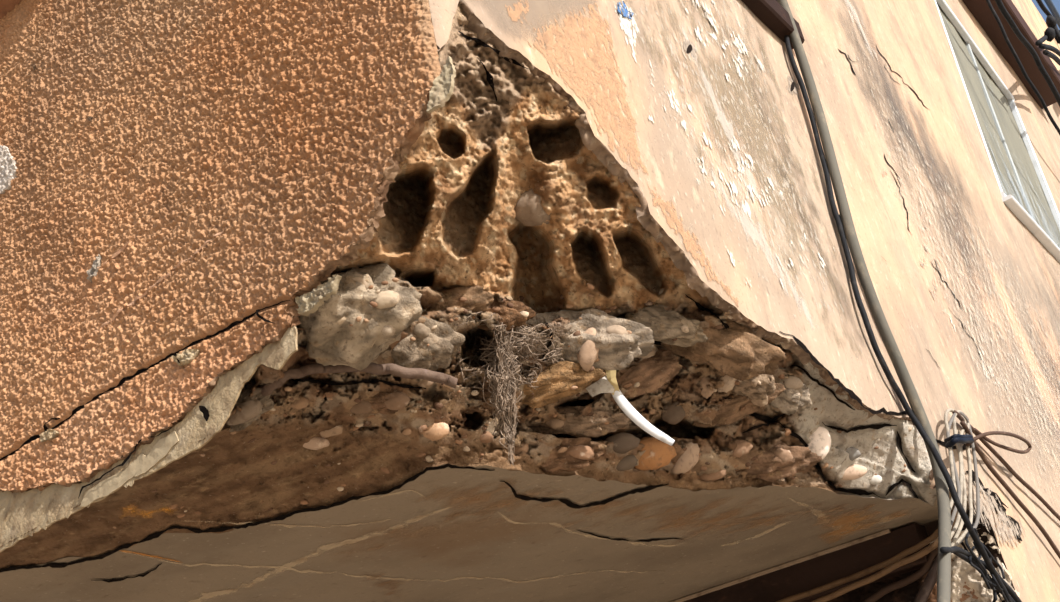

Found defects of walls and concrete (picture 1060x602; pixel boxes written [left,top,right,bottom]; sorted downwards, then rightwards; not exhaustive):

peeling [0,145,17,194]
peeling [648,89,692,131]
damp [659,2,808,246]
peeling [696,132,783,218]
crack [884,119,911,233]
crack [876,45,928,109]
damp [875,65,970,267]
peeling [649,187,739,307]
crack [0,300,290,461]
flaking render [0,326,298,553]
crack [0,463,684,583]
flaking render [951,470,1026,602]